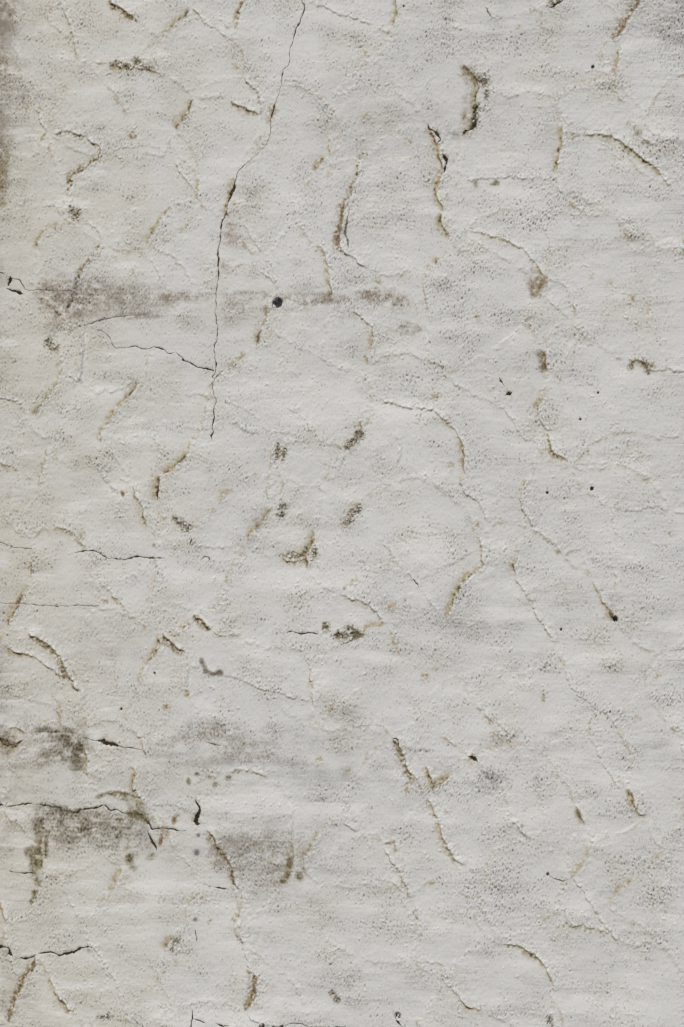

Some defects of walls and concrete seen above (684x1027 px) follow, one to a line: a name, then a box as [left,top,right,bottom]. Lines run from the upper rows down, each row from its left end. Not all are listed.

crack [428,104,480,172]
crack [85,0,305,439]
crack [343,207,351,248]
crack [0,272,72,295]
crack [75,550,161,560]
crack [4,601,98,609]
crack [287,631,362,645]
crack [84,737,141,750]
crack [0,799,201,851]
water stain [24,846,41,902]
water stain [214,836,301,883]
crack [0,945,92,960]